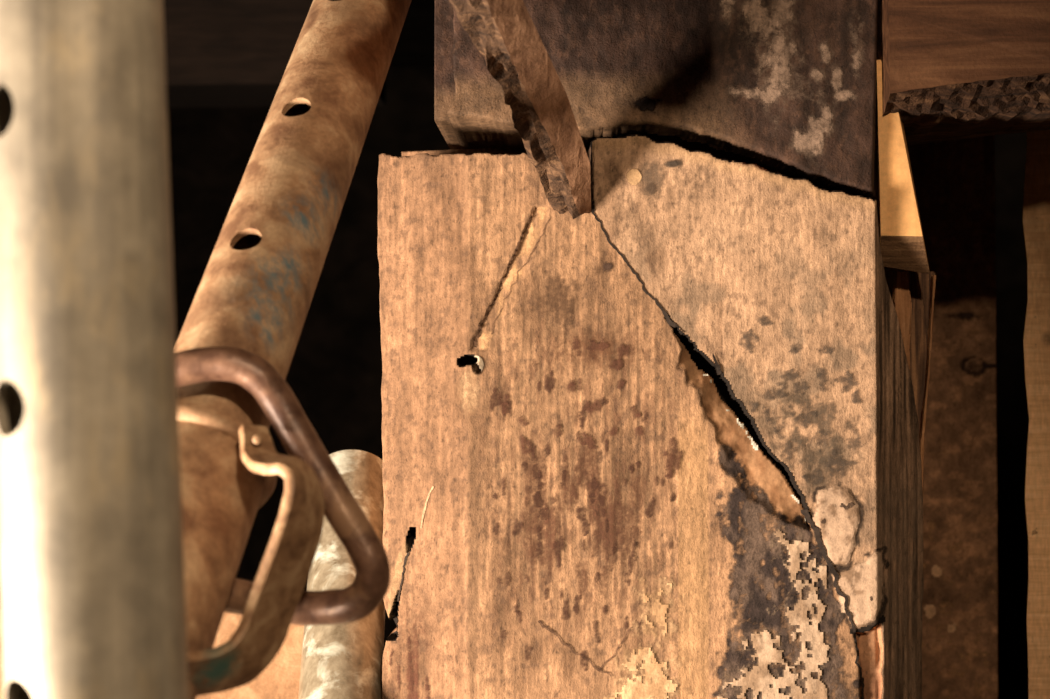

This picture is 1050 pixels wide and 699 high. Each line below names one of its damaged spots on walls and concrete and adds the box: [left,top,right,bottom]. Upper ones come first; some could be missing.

water stain [721,0,802,103]
water stain [793,45,862,156]
water stain [490,388,511,416]
water stain [536,363,555,392]
crack [586,132,875,699]
water stain [512,407,655,620]
crack [397,553,409,602]
water stain [712,445,861,699]